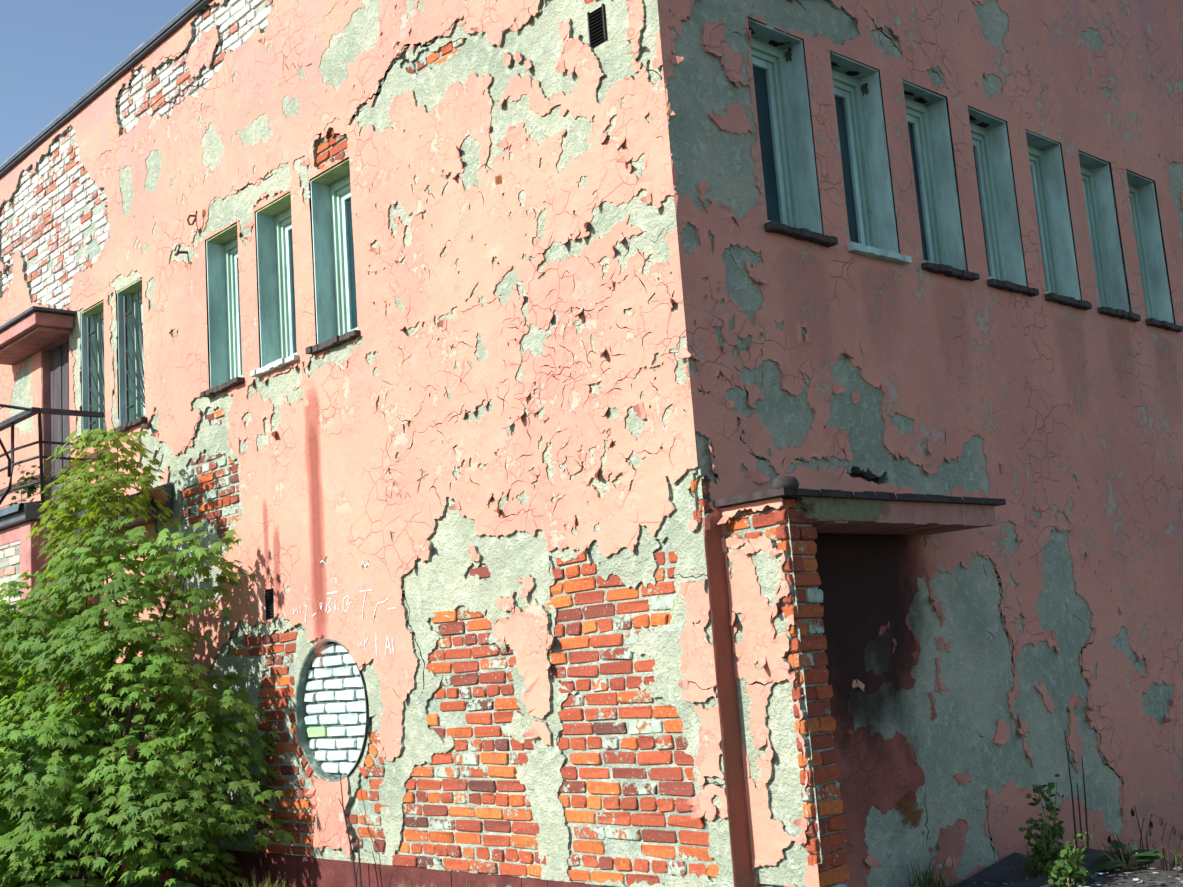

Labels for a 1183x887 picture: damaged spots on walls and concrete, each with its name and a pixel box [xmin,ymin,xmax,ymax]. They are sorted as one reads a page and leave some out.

peeling [972,0,1010,54]
peeling [1158,154,1183,235]
crack [379,206,683,518]
crack [724,341,765,399]
crack [710,436,804,481]
spalling [206,431,850,887]
peeling [853,474,1157,887]
peeling [1110,607,1175,732]